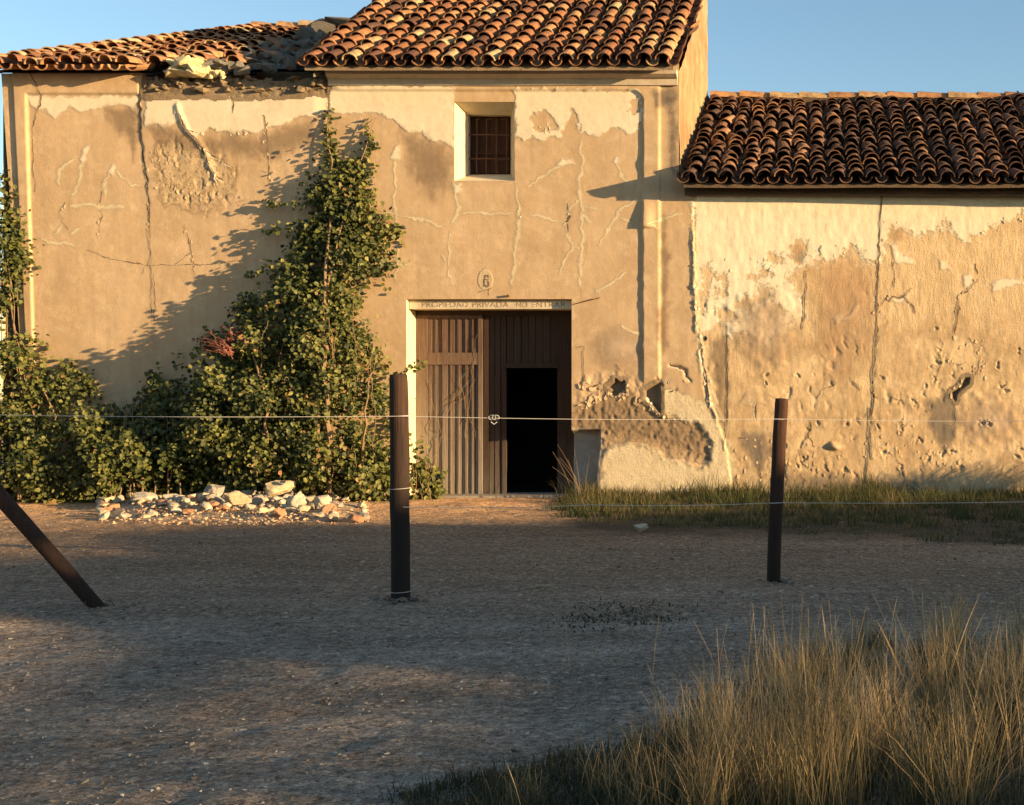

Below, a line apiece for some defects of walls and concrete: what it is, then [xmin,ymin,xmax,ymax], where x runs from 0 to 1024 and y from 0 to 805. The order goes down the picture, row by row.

crack [28,72,237,321]
peeling [28,17,456,213]
peeling [512,86,644,142]
peeling [572,187,1024,497]
crack [800,196,916,483]